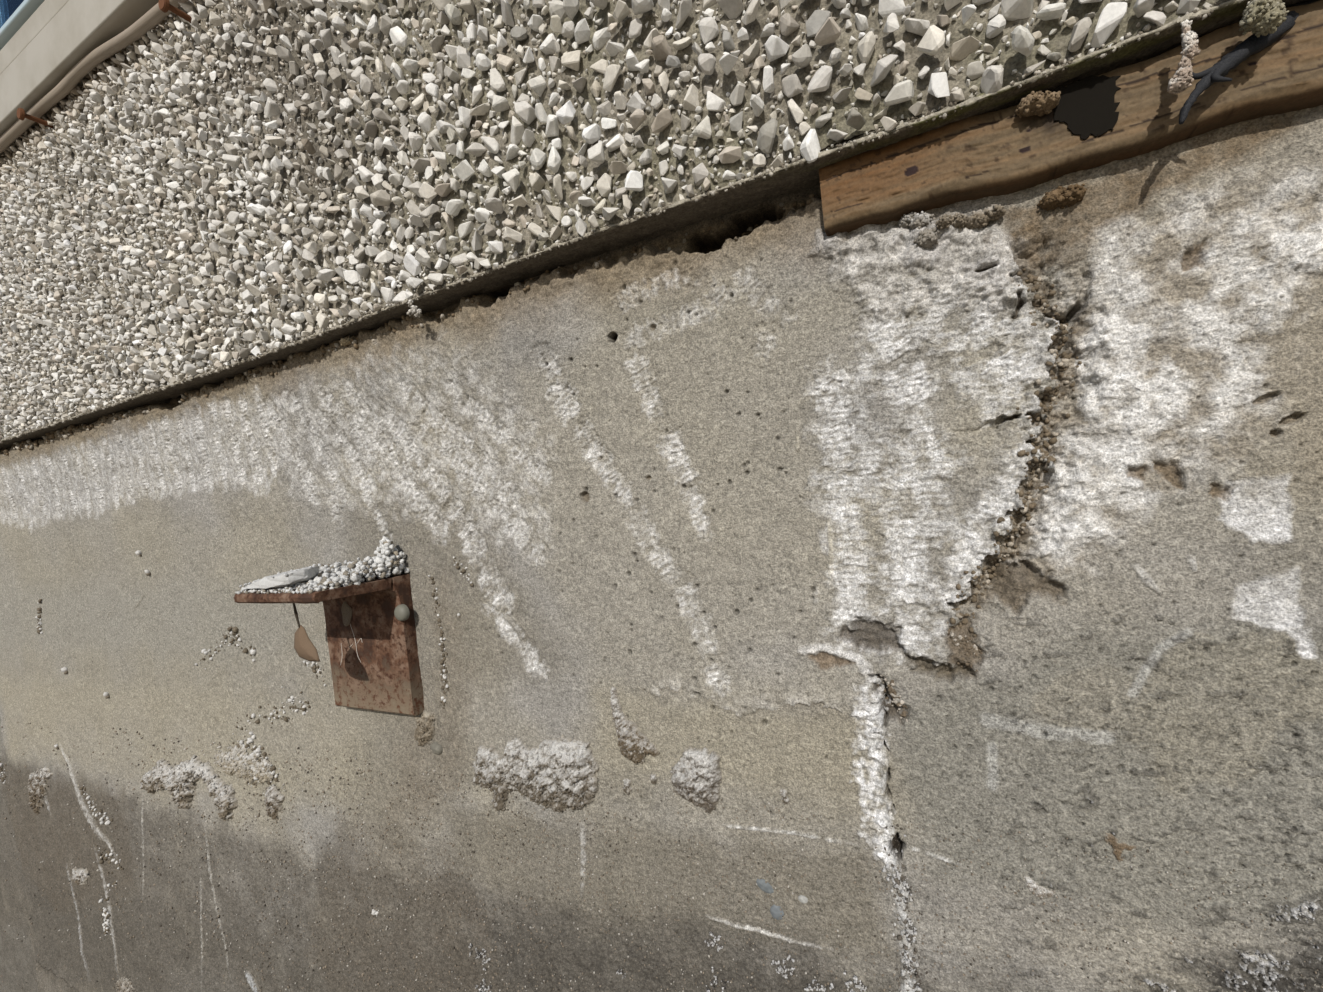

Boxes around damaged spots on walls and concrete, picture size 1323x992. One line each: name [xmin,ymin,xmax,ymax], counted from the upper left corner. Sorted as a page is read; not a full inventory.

peeling [241,566,320,590]
spalling [0,0,1211,439]
leakage [0,560,1323,992]
crack [836,234,1095,992]
spalling [807,158,1323,587]